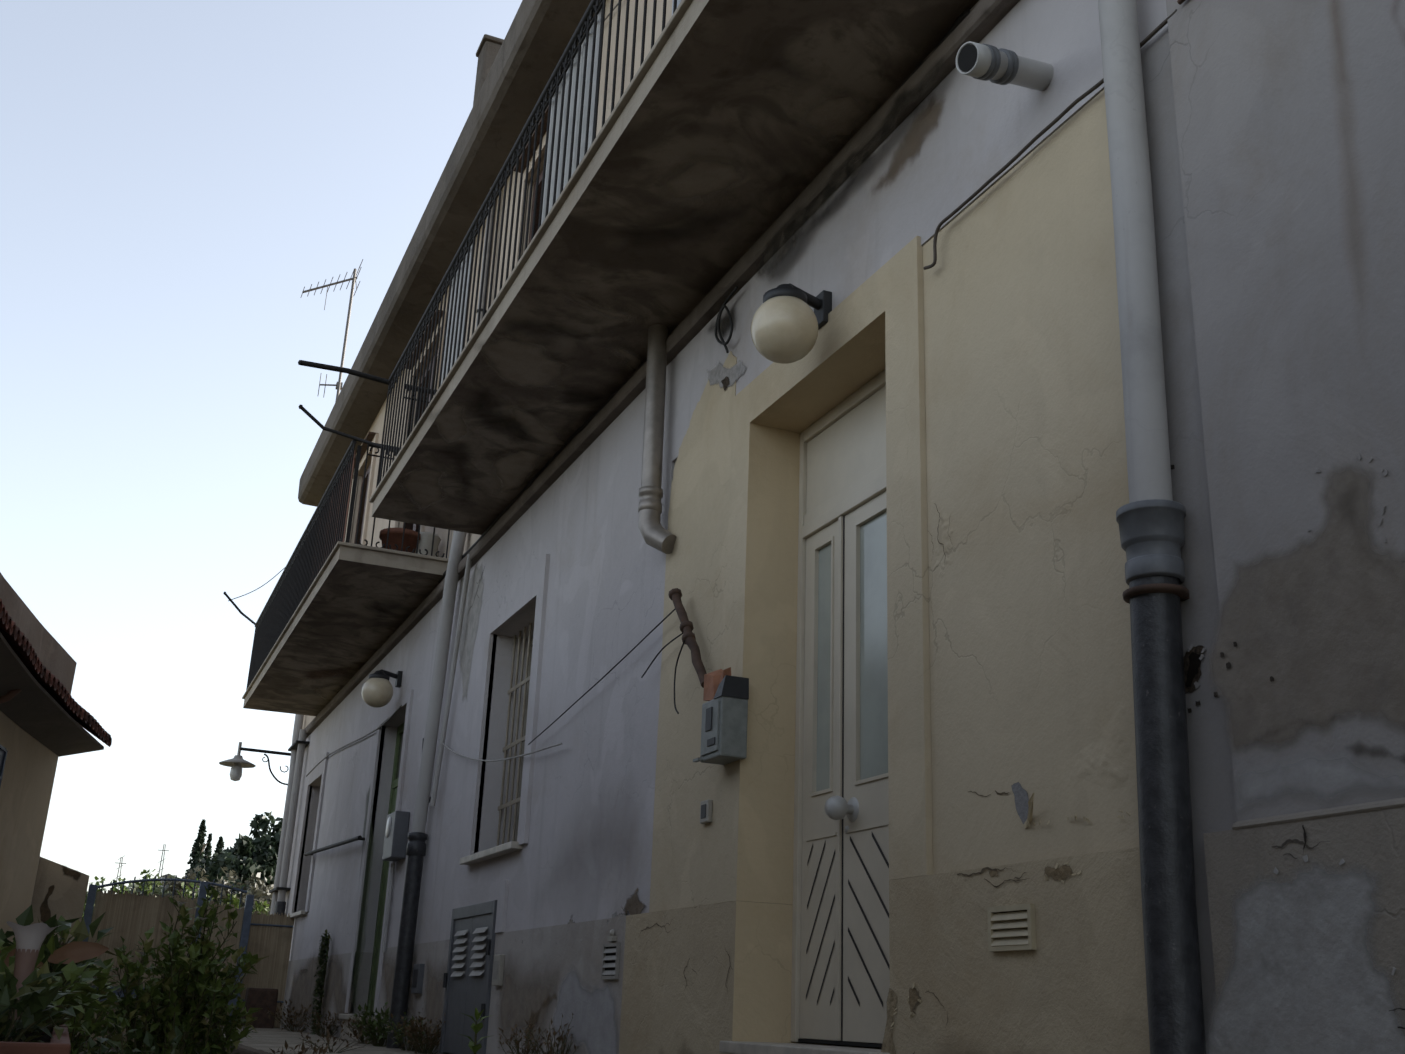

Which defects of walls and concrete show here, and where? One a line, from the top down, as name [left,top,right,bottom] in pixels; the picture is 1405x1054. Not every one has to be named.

water stain [757,62,943,277]
water stain [435,324,564,491]
spalling [1183,642,1237,713]
peeling [1011,782,1035,829]
spalling [607,888,645,925]
spalling [1044,861,1081,884]
crack [1272,825,1330,859]
peeling [1208,855,1405,1054]
spalling [881,982,921,1054]